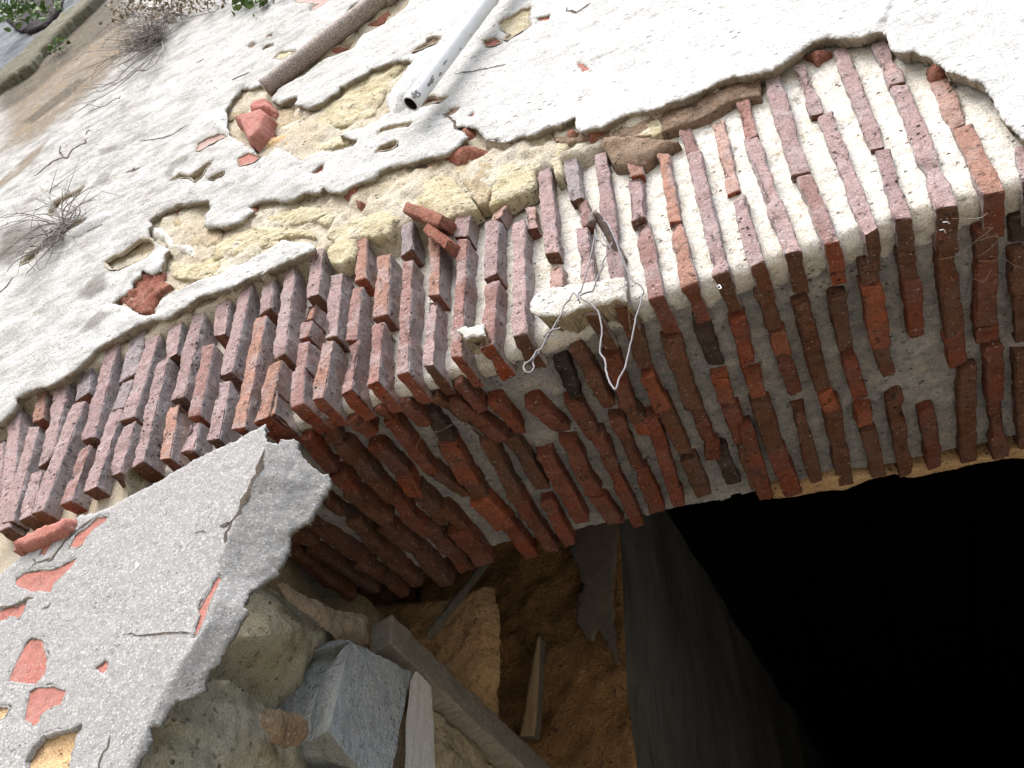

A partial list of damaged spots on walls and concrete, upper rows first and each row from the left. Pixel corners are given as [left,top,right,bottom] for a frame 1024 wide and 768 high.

spalling [411,59,461,117]
spalling [169,133,227,182]
spalling [237,152,262,167]
spalling [374,121,413,153]
spalling [103,237,156,271]
crack [196,450,265,543]
spalling [0,515,110,622]
spalling [192,575,223,638]
spalling [0,705,11,720]
spalling [6,635,84,768]